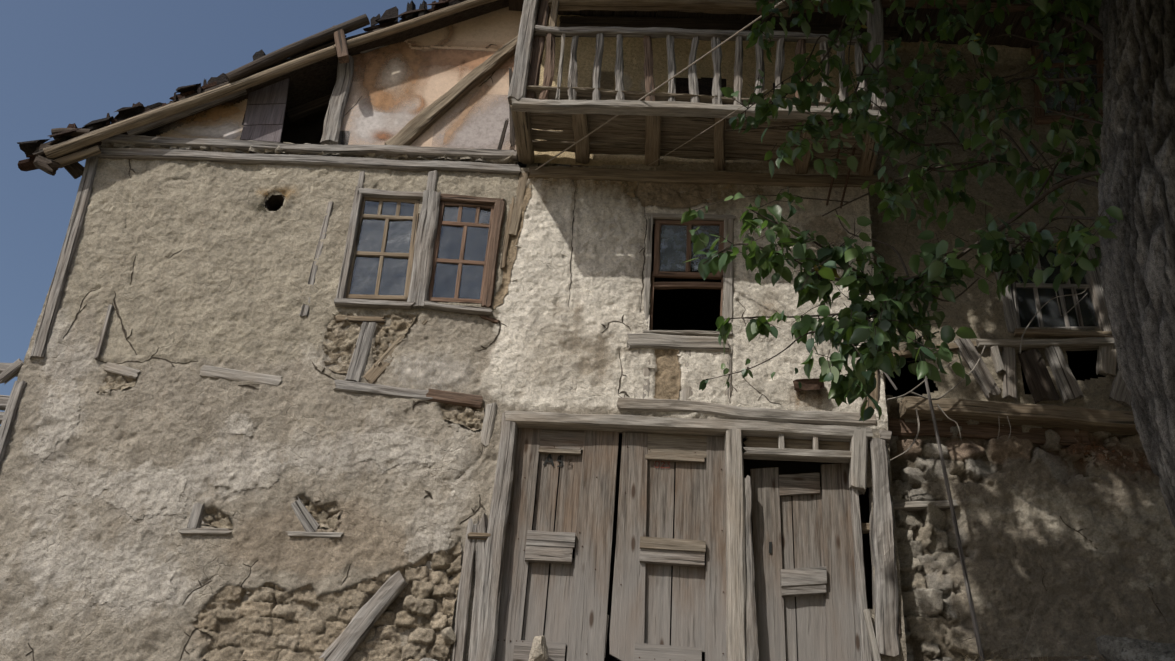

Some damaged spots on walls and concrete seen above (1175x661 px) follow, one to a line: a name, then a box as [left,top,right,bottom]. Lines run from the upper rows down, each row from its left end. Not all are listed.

water stain [382,59,406,87]
water stain [351,97,415,143]
crack [63,256,198,394]